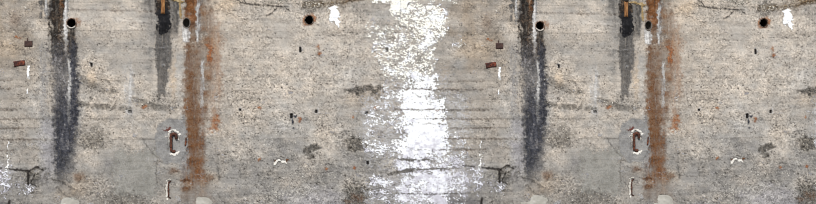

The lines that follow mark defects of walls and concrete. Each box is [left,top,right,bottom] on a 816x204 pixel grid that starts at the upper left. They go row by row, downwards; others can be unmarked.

peeling [0,157,49,199]
water stain [38,0,80,172]
water stain [155,0,179,94]
corrosion [181,0,220,193]
peeling [344,0,511,204]
water stain [509,0,549,169]
water stain [612,0,641,95]
corrosion [644,0,680,190]